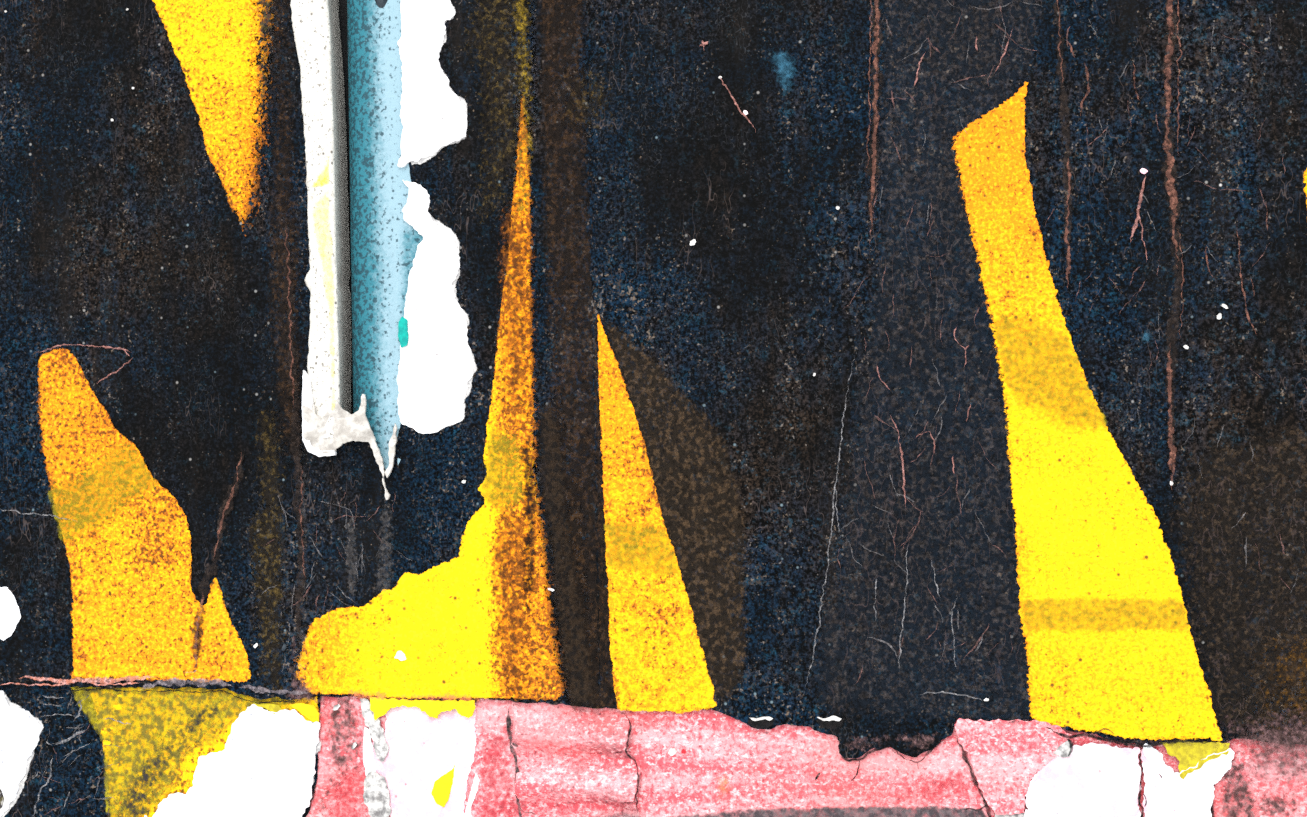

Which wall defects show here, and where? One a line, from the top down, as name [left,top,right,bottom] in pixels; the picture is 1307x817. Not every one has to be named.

peeling [398,317,408,348]